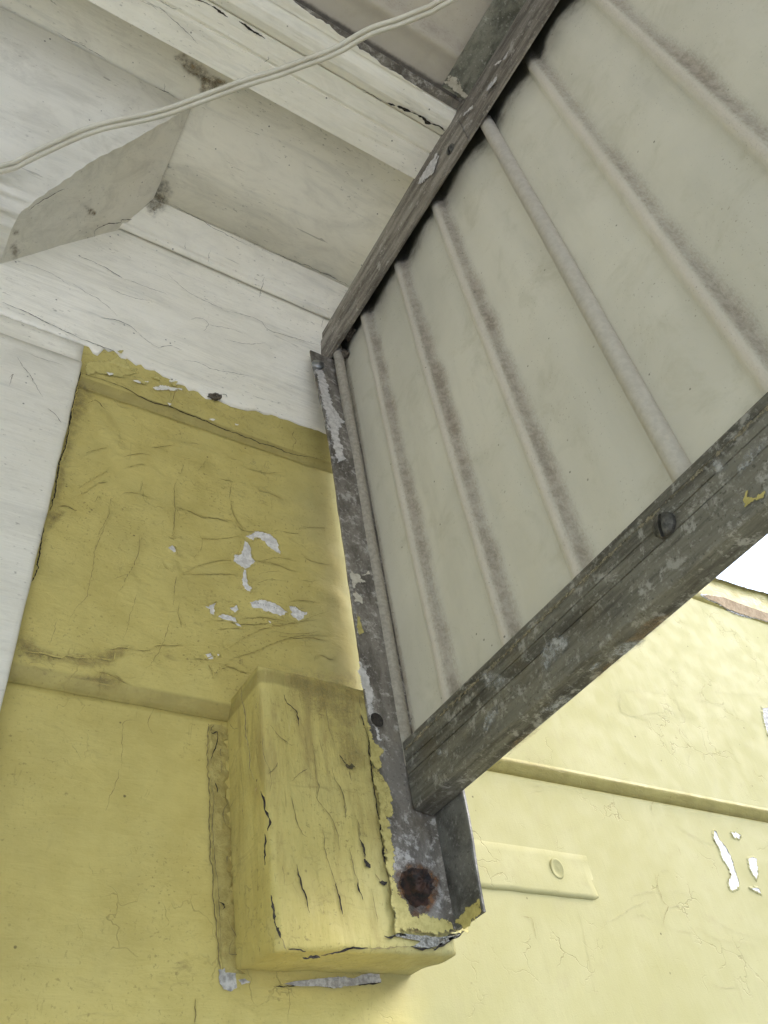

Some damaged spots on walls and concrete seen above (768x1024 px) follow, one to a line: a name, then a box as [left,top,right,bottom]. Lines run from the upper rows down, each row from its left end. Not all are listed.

peeling [85,350,182,406]
peeling [201,530,309,629]
crack [8,357,426,959]
peeling [711,830,762,896]
peeling [219,968,250,992]
flaking render [274,973,381,989]